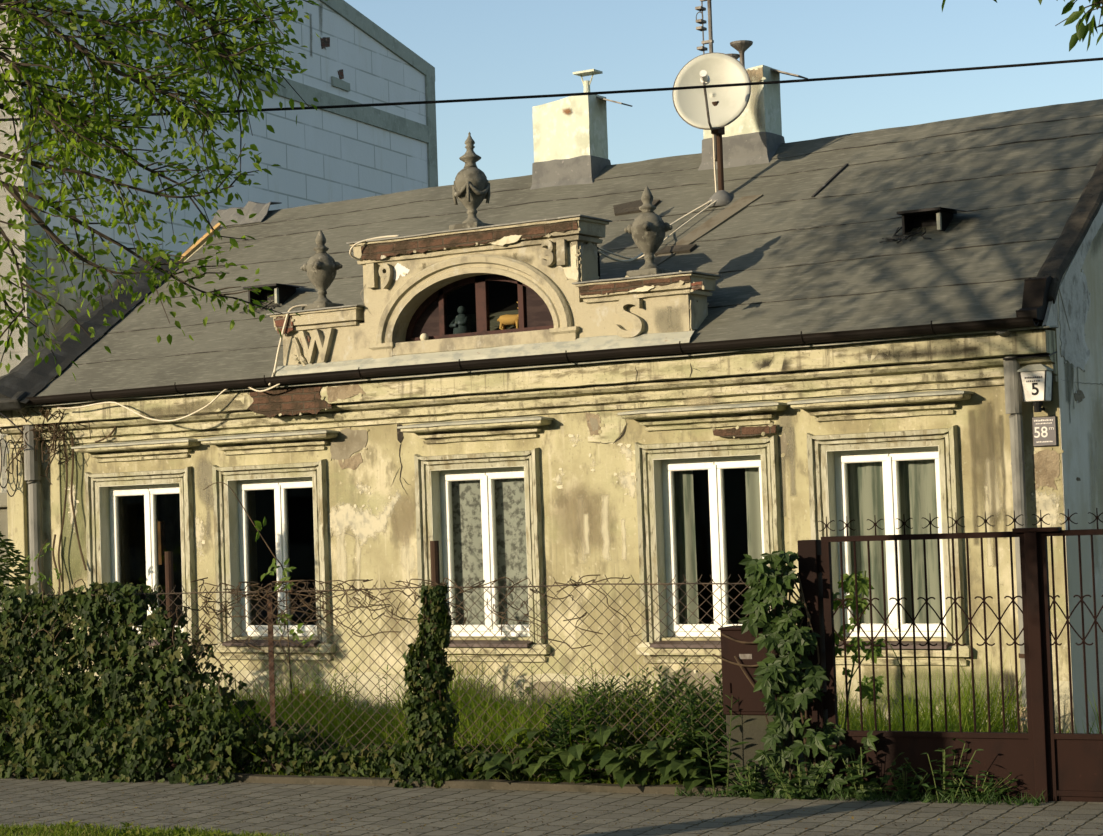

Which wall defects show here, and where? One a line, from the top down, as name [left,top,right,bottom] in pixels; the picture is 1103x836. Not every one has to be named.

leakage [1065,360,1079,421]
spalling [711,423,789,457]
peeling [328,482,401,546]
leakage [578,499,589,559]
leakage [602,496,626,560]